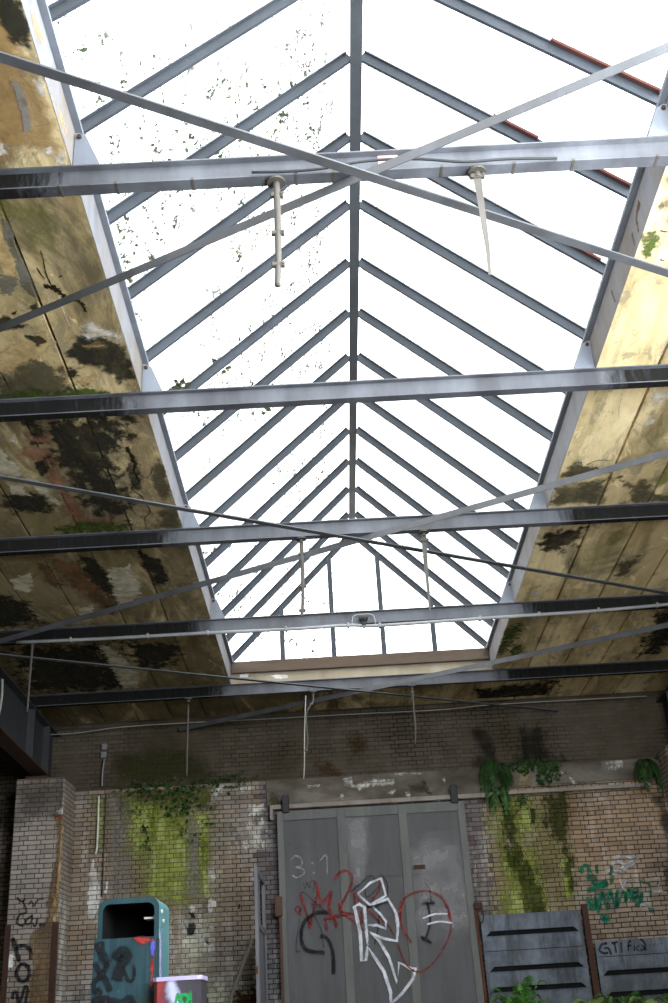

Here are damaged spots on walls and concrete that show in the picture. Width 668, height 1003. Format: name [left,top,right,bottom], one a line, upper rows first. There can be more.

leakage [0,0,65,164]
crack [37,250,87,312]
leakage [1,492,56,515]
peeling [0,434,60,505]
leakage [21,415,180,528]